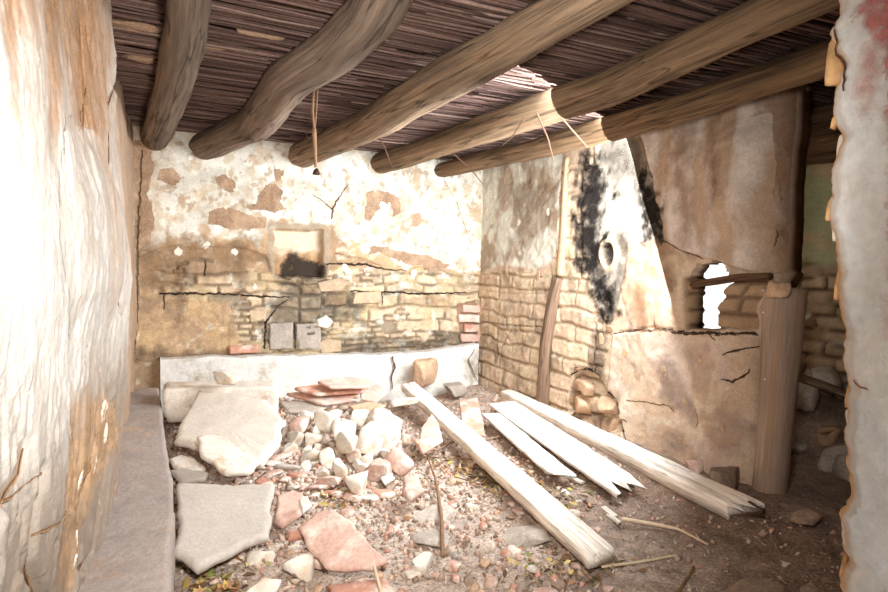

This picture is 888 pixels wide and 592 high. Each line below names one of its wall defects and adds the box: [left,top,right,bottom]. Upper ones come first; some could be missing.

damp [634,163,665,244]
spalling [133,140,623,433]
crack [326,262,467,305]
crack [389,356,397,389]
crack [570,317,760,433]
crack [0,448,42,507]
crack [24,457,91,592]